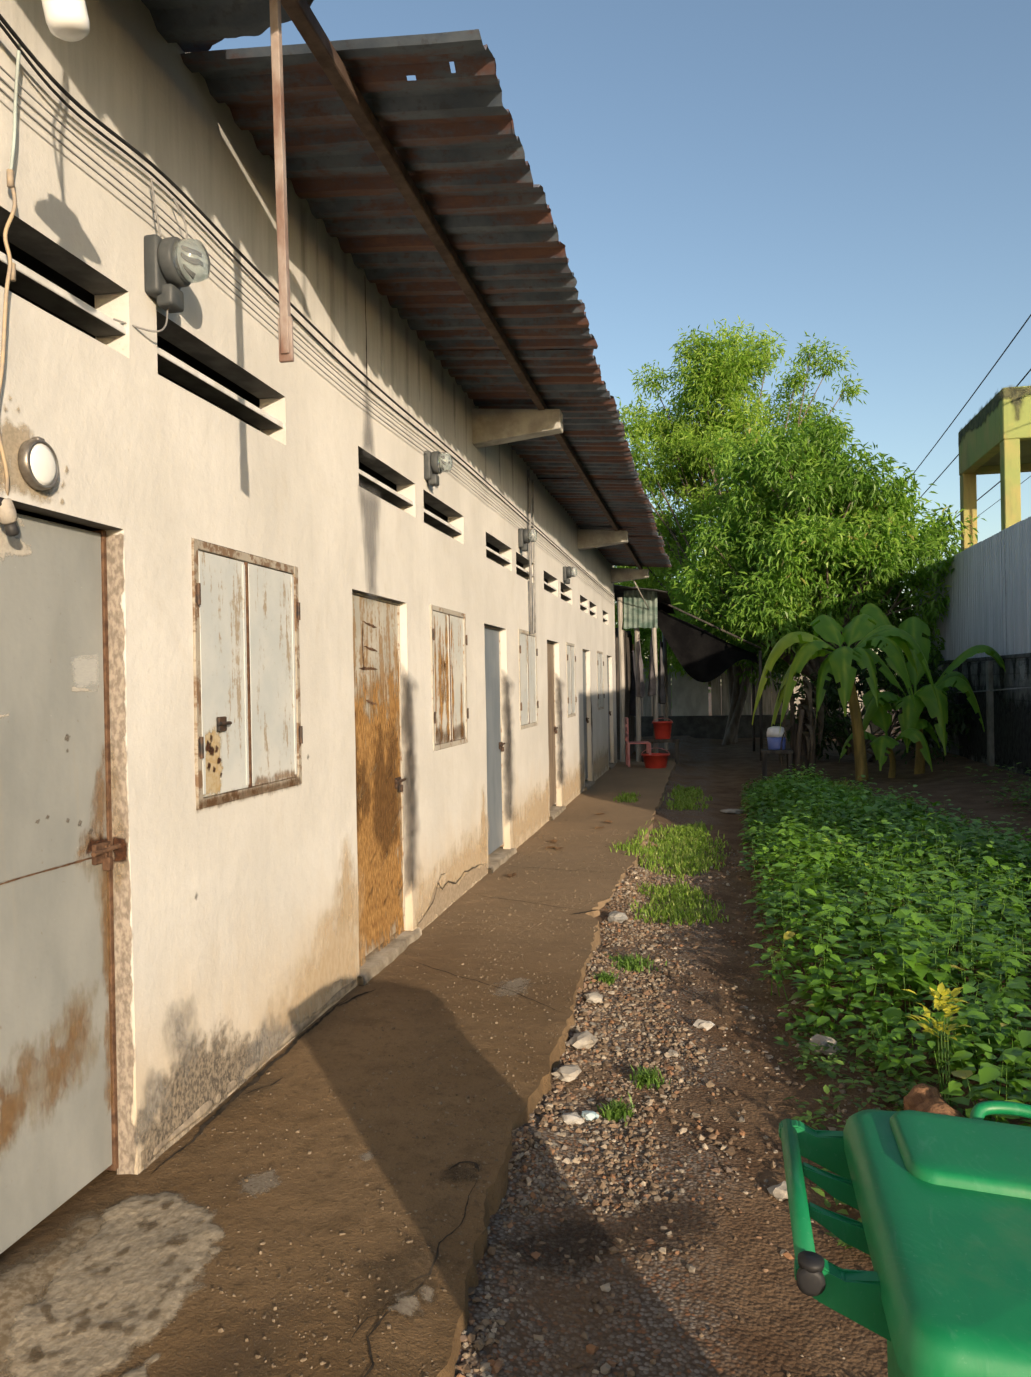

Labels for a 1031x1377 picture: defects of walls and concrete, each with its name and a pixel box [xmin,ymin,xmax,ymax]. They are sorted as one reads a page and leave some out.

peeling [0,396,69,503]
rust [434,615,465,744]
rust [199,730,300,809]
rust [354,619,405,966]
rust [0,1065,28,1145]
water stain [136,1016,288,1170]
peeling [22,1201,192,1366]
crack [351,1178,478,1377]
peeling [122,1354,160,1377]